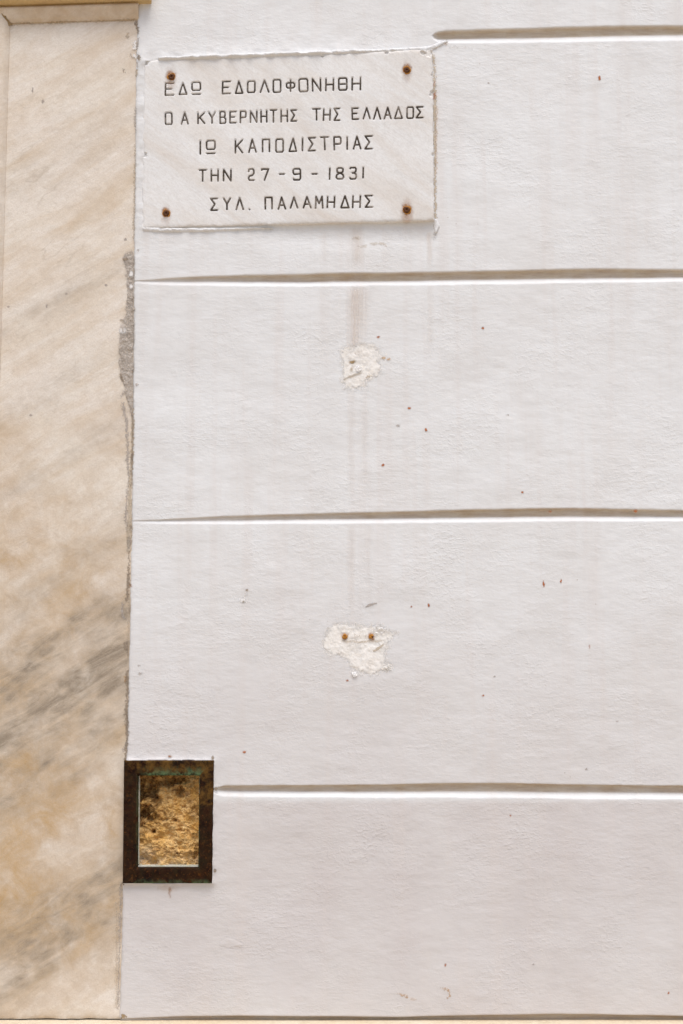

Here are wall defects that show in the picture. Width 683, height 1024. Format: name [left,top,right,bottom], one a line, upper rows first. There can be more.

flaking render [340,343,390,389]
flaking render [322,623,394,677]